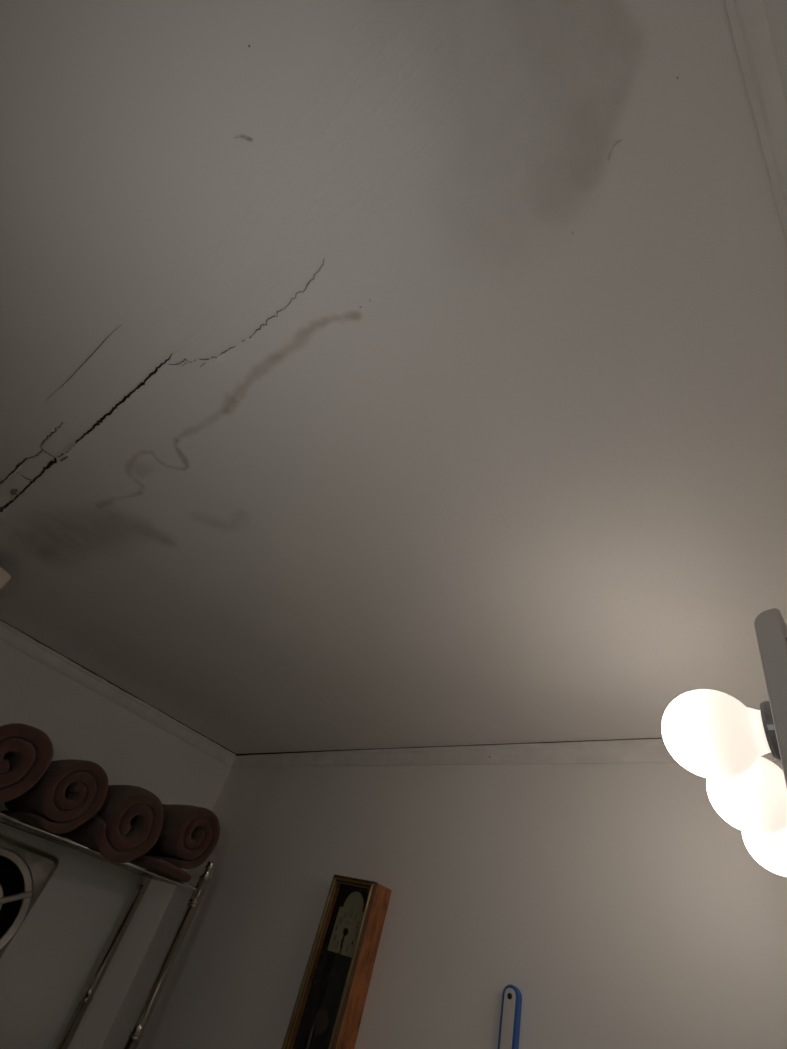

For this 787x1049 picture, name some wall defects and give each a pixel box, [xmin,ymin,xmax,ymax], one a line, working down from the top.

crack [53,325,121,394]
crack [0,340,190,520]